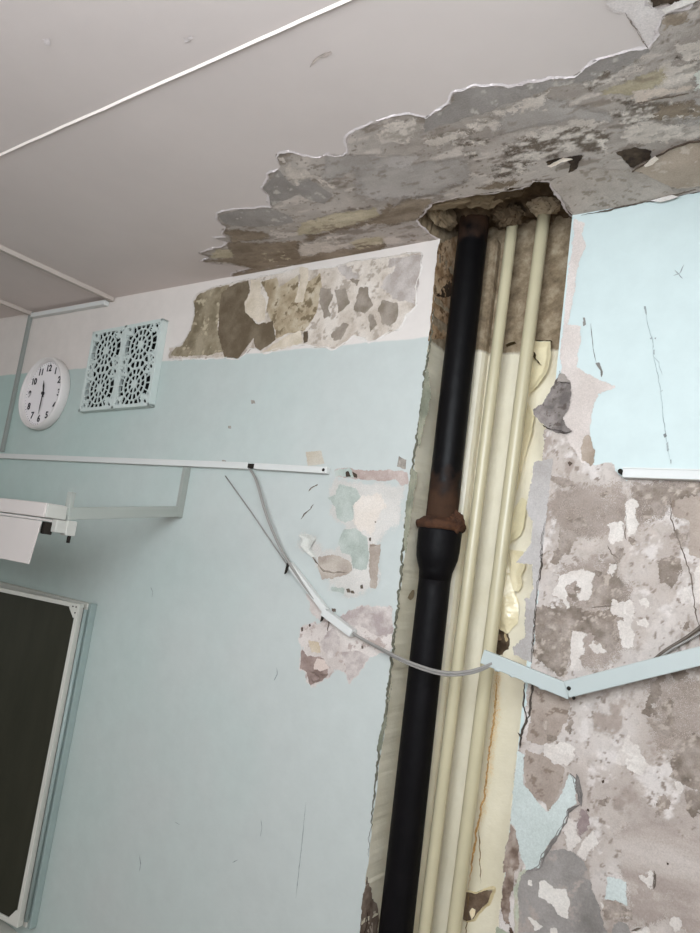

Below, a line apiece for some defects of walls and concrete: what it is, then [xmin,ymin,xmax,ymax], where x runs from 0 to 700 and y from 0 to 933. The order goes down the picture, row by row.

peeling [168,0,697,361]
crack [632,140,700,173]
spalling [416,180,615,544]
crack [644,306,672,463]
peeling [296,456,409,688]
corrosion [450,510,465,534]
flaking render [360,877,379,933]